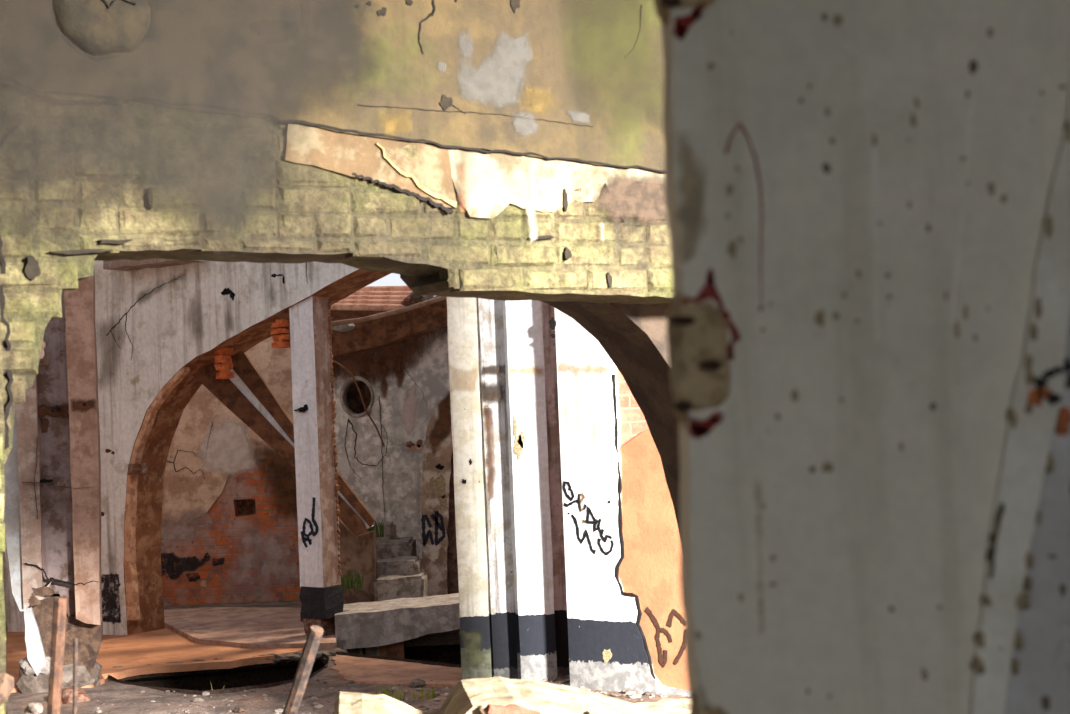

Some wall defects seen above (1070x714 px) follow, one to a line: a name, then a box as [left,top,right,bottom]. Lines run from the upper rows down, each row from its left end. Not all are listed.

crack [418,0,436,54]
spalling [653,0,715,40]
flaking render [282,123,458,214]
crack [288,104,665,173]
peeling [570,112,588,122]
peeling [679,149,701,258]
crack [109,276,181,360]
spalling [667,268,740,439]
crack [167,423,213,481]